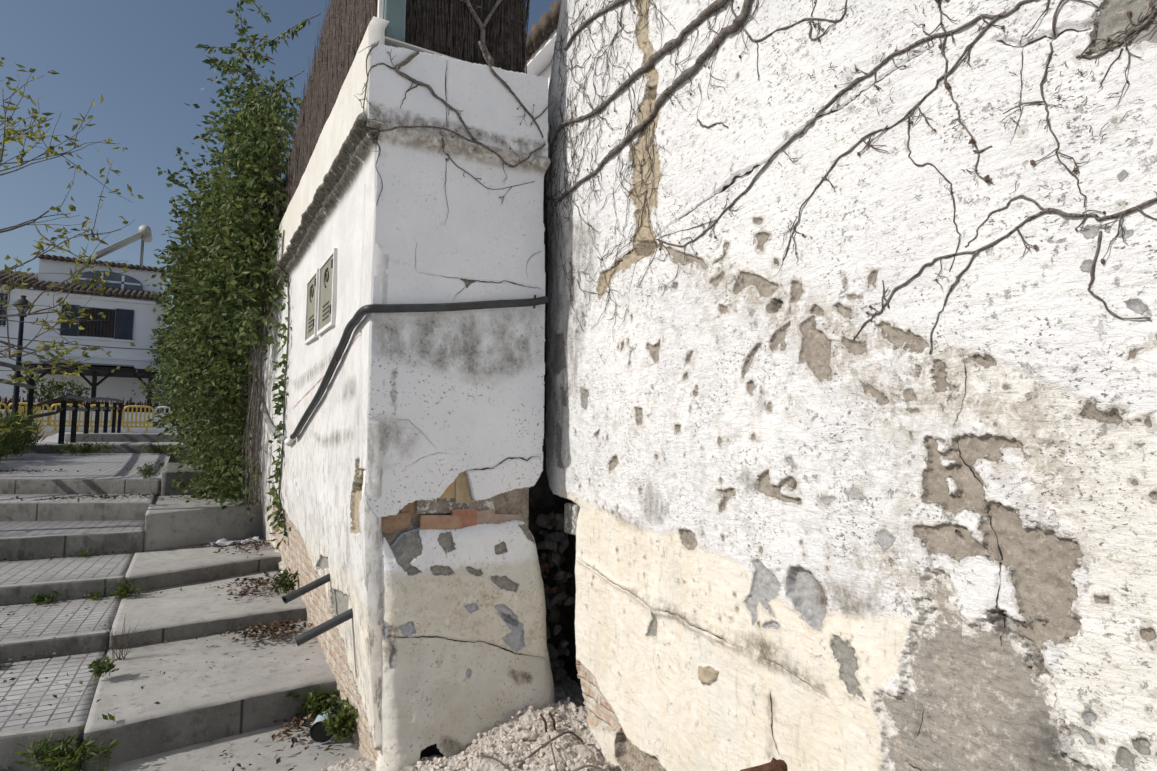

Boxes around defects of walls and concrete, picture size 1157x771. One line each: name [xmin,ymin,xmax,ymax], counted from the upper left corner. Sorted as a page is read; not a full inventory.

peeling [1078,0,1157,60]
peeling [596,0,878,412]
crack [394,175,735,688]
peeling [860,321,968,413]
peeling [959,353,996,368]
flaking render [350,459,535,593]
crack [953,364,1006,644]
flaking render [272,485,382,771]
peeling [383,620,416,669]
peeling [495,604,525,652]
peeling [720,422,1157,771]
flaking render [576,660,666,771]